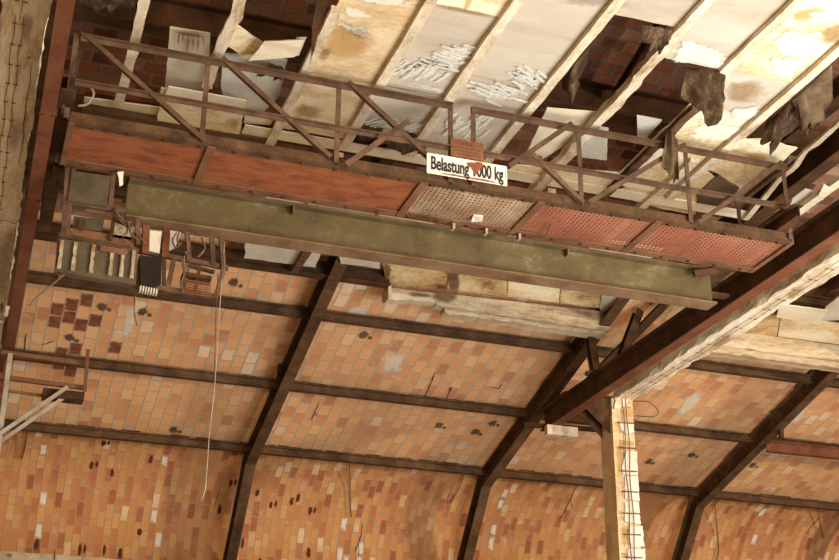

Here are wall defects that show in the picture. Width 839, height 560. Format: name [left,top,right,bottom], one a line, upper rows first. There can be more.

water stain [795,8,821,20]
water stain [319,29,365,59]